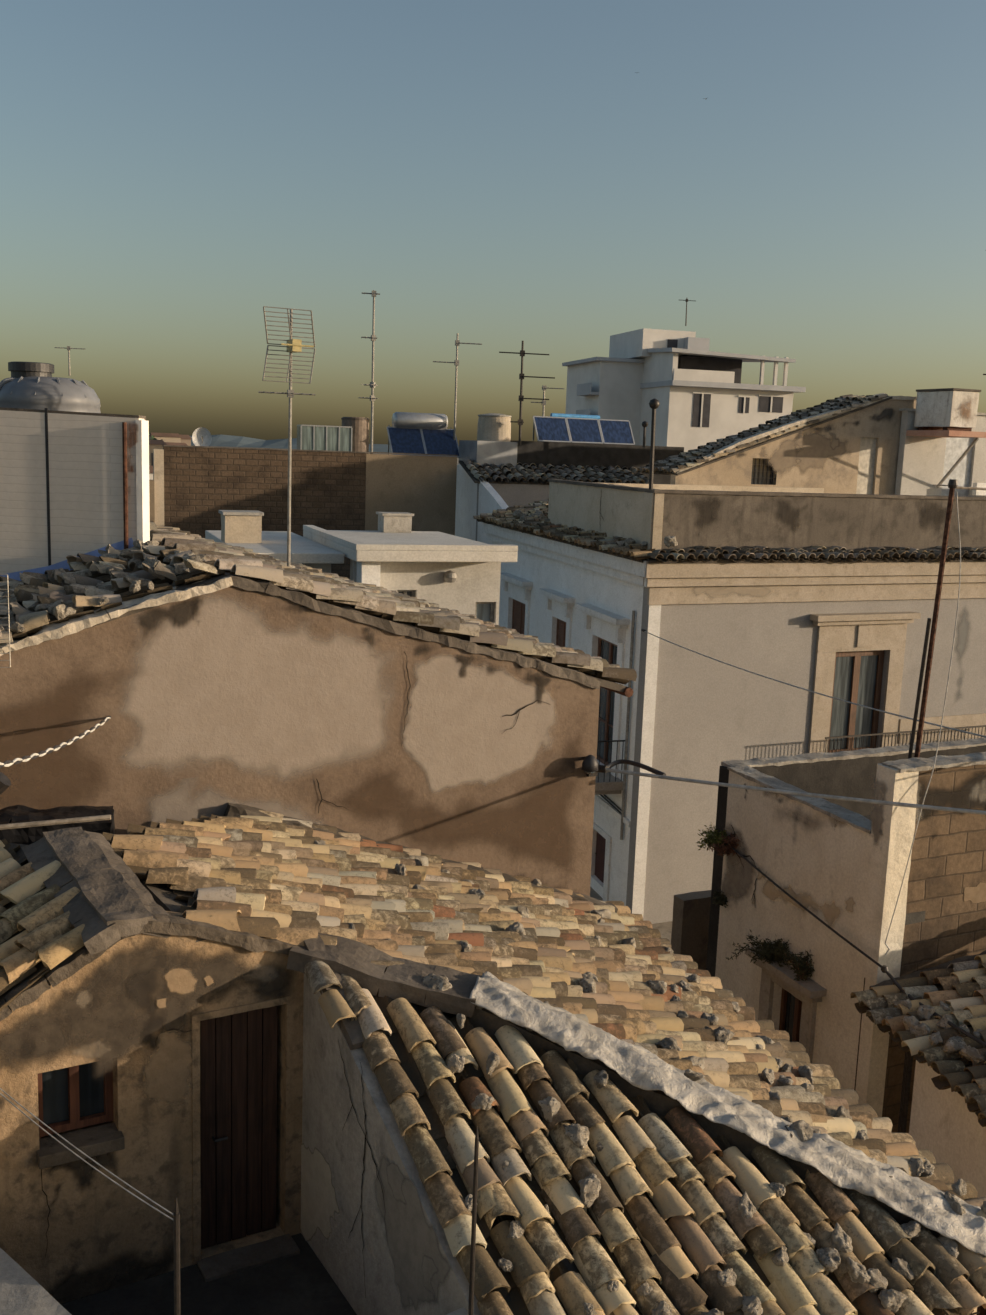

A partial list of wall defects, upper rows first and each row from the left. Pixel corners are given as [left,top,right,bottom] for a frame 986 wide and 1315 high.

leakage [956,611,969,658]
crack [401,652,411,746]
crack [502,700,551,732]
leakage [128,968,163,1049]
leakage [52,1152,117,1187]